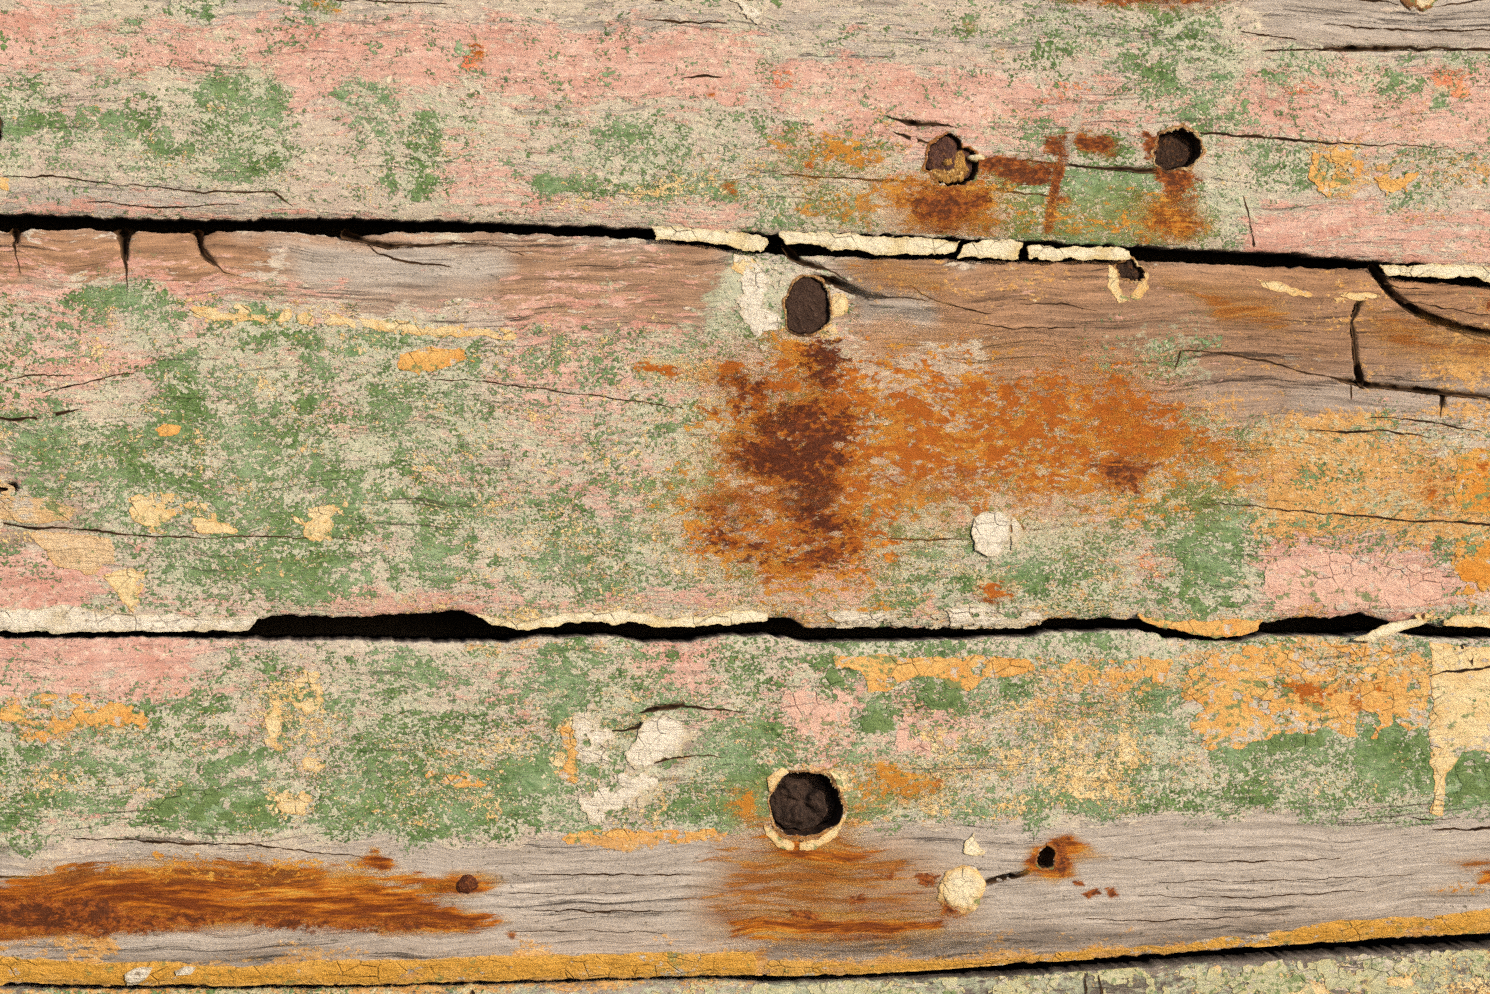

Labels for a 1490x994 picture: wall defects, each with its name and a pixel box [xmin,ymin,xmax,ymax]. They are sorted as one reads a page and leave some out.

crack [340,229,525,267]
crack [781,241,1097,330]
corrosion [767,128,1212,244]
crack [1243,196,1255,247]
corrosion [633,318,1289,623]
peeling [779,447,1490,816]
peeling [558,698,727,845]
corrosion [0,850,515,941]
peeling [764,814,846,851]
corrosion [686,760,966,941]
corrosion [1025,836,1119,899]
peeling [0,908,1490,994]